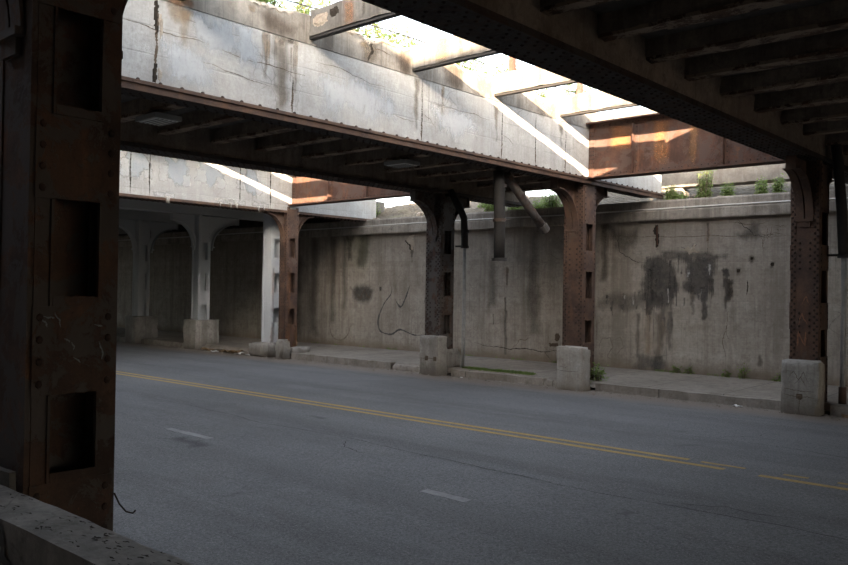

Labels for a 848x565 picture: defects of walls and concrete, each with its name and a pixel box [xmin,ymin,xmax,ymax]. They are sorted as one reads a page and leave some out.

crack [123,15,391,112]
crack [374,84,510,158]
peeling [120,151,225,189]
peeling [237,169,263,196]
water stain [601,227,733,320]